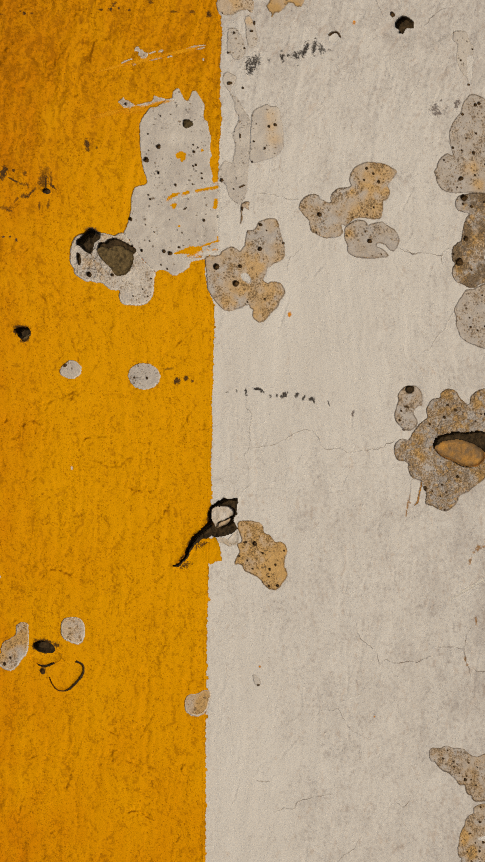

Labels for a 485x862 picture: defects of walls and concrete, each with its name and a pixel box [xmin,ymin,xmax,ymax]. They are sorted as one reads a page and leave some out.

peeling [69,72,285,323]
peeling [299,162,400,259]
peeling [434,31,485,349]
peeling [128,363,161,390]
spalling [394,385,485,512]
peeling [235,521,288,590]
peeling [0,622,29,671]
peeling [61,617,85,645]
peeling [185,690,211,717]
peeling [429,746,485,862]